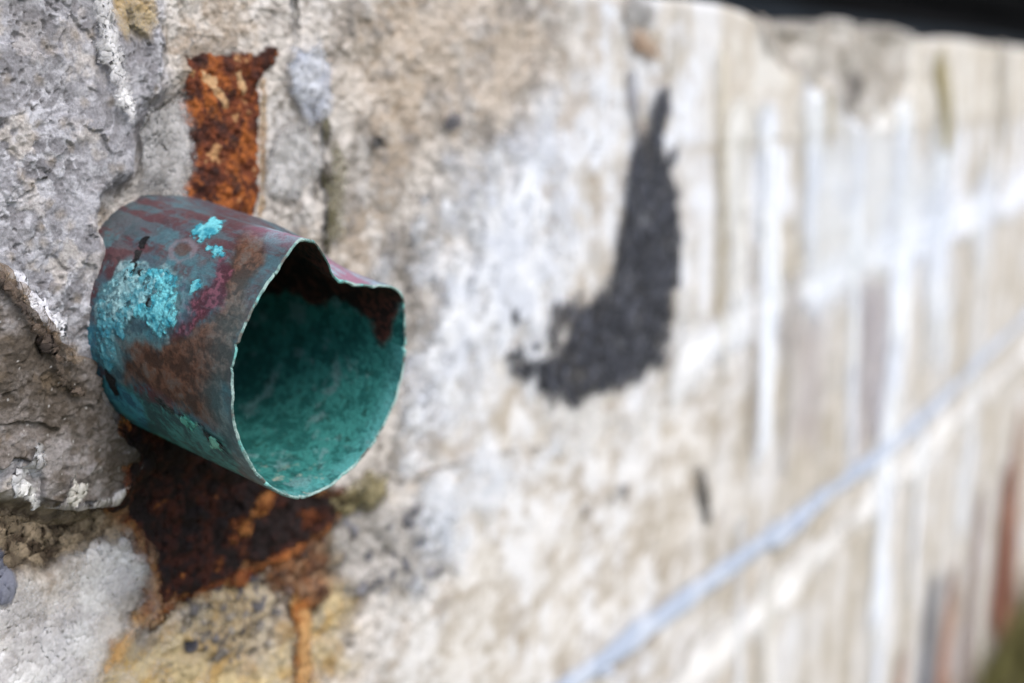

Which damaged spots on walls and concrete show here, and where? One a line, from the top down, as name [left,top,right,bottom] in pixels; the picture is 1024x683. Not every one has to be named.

corrosion [104,418,356,683]